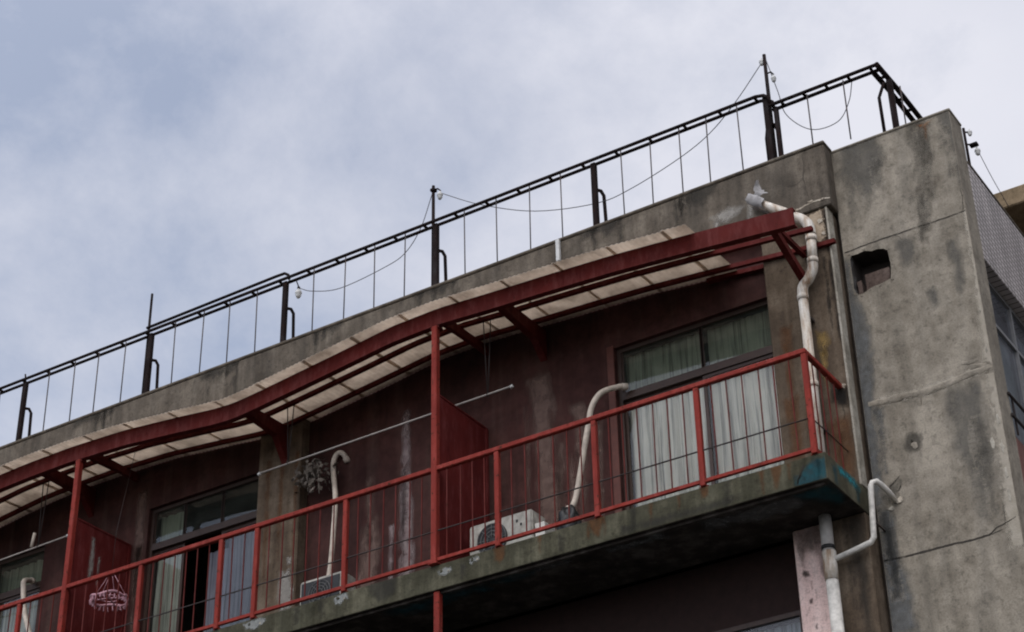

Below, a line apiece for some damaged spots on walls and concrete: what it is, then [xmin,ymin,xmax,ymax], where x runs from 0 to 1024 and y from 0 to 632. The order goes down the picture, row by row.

water stain [842,139,880,192]
hole [851,263,894,297]
water stain [527,375,587,531]
spalling [906,435,920,449]
water stain [368,414,414,600]
crack [884,501,1015,562]